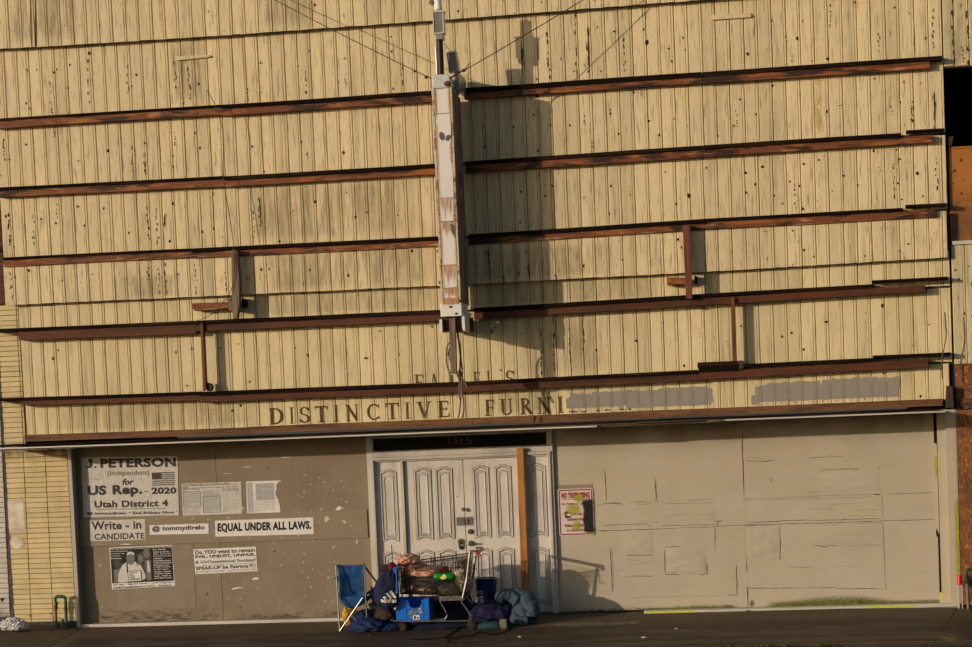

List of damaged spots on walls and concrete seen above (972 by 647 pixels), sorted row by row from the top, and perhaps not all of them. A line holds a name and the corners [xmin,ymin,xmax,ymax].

rust [438,187,459,304]